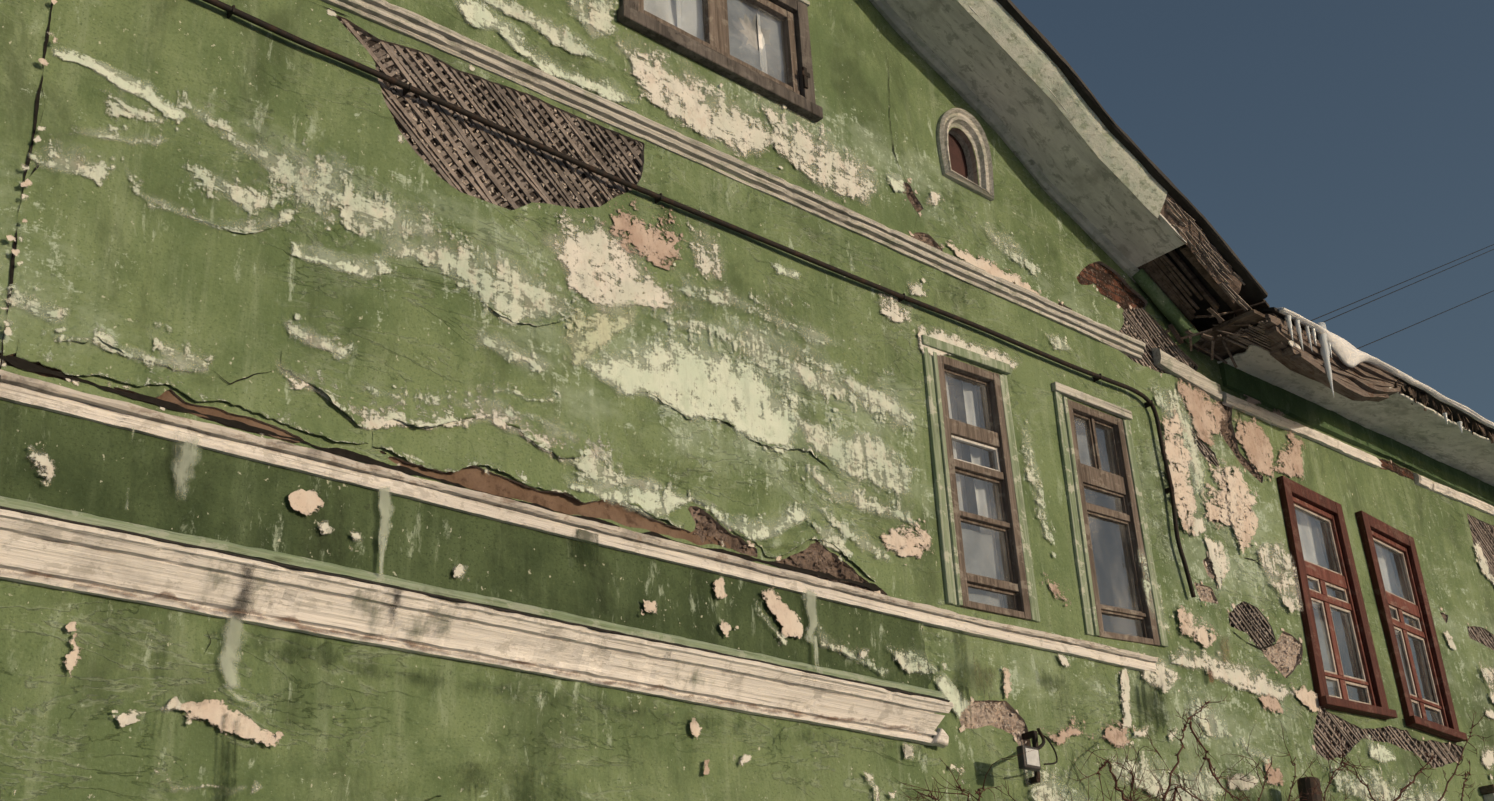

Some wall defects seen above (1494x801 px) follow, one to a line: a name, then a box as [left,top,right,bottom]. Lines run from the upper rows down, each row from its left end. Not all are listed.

peeling [459,0,1064,306]
crack [0,0,882,591]
peeling [0,8,936,594]
peeling [756,263,1462,801]
flaking render [1467,514,1494,586]
peeling [62,621,81,677]
peeling [641,599,657,616]
peeling [714,575,727,599]
peeling [720,621,739,637]
peeling [112,696,284,747]
peeling [690,718,702,737]
peeling [1482,746,1494,779]